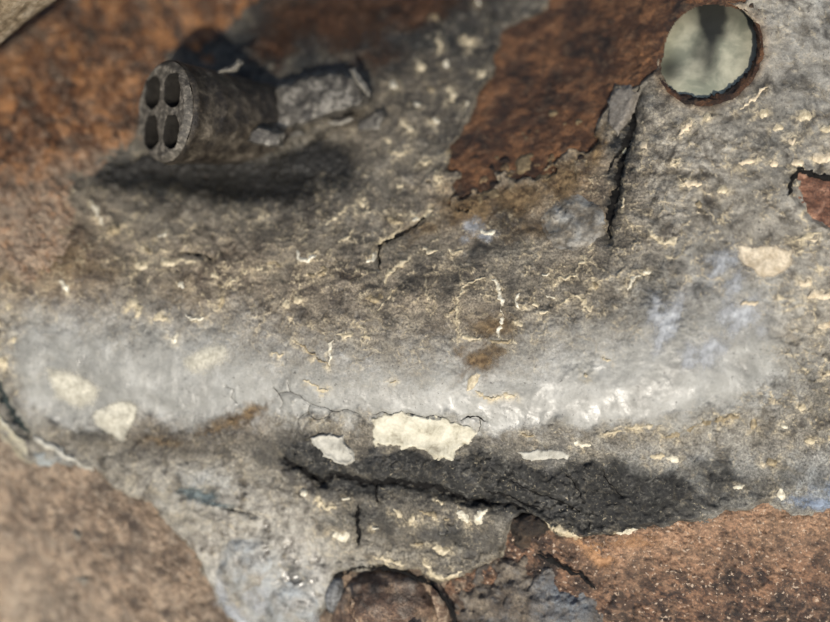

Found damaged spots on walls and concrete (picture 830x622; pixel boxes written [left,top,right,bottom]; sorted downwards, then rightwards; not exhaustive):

crack [605,85,640,240]
crack [377,208,433,269]
water stain [711,253,737,277]
water stain [649,299,682,348]
water stain [722,301,759,331]
crack [0,382,30,434]
peeling [93,402,136,440]
peeling [311,432,355,466]
peeling [371,411,477,461]
peeling [517,449,569,461]
spalling [0,416,235,622]
spalling [318,488,830,622]